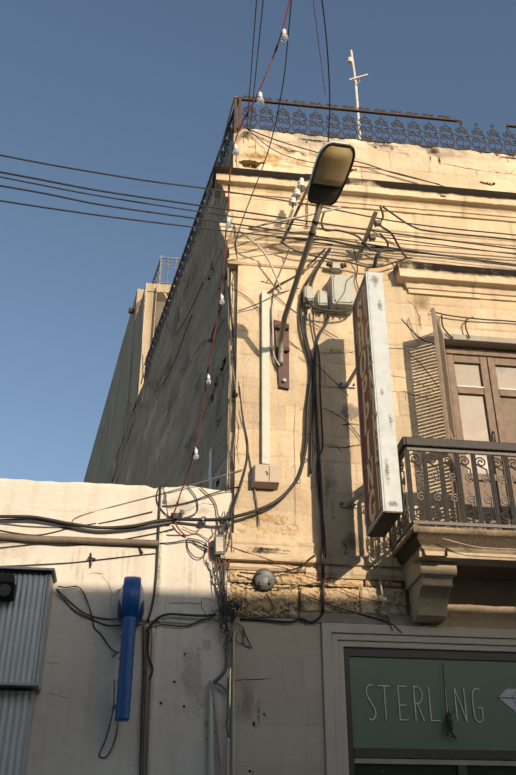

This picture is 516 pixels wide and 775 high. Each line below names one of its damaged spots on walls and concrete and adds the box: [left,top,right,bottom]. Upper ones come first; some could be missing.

spalling [238,146,306,169]